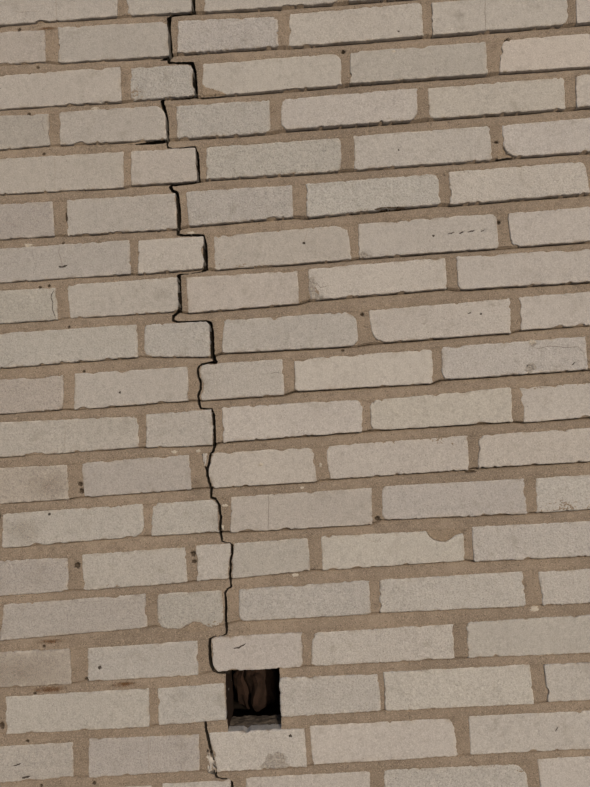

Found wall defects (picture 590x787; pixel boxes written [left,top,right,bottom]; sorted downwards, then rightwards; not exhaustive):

crack [135,0,234,674]
spalling [226,668,282,729]
crack [204,721,234,787]